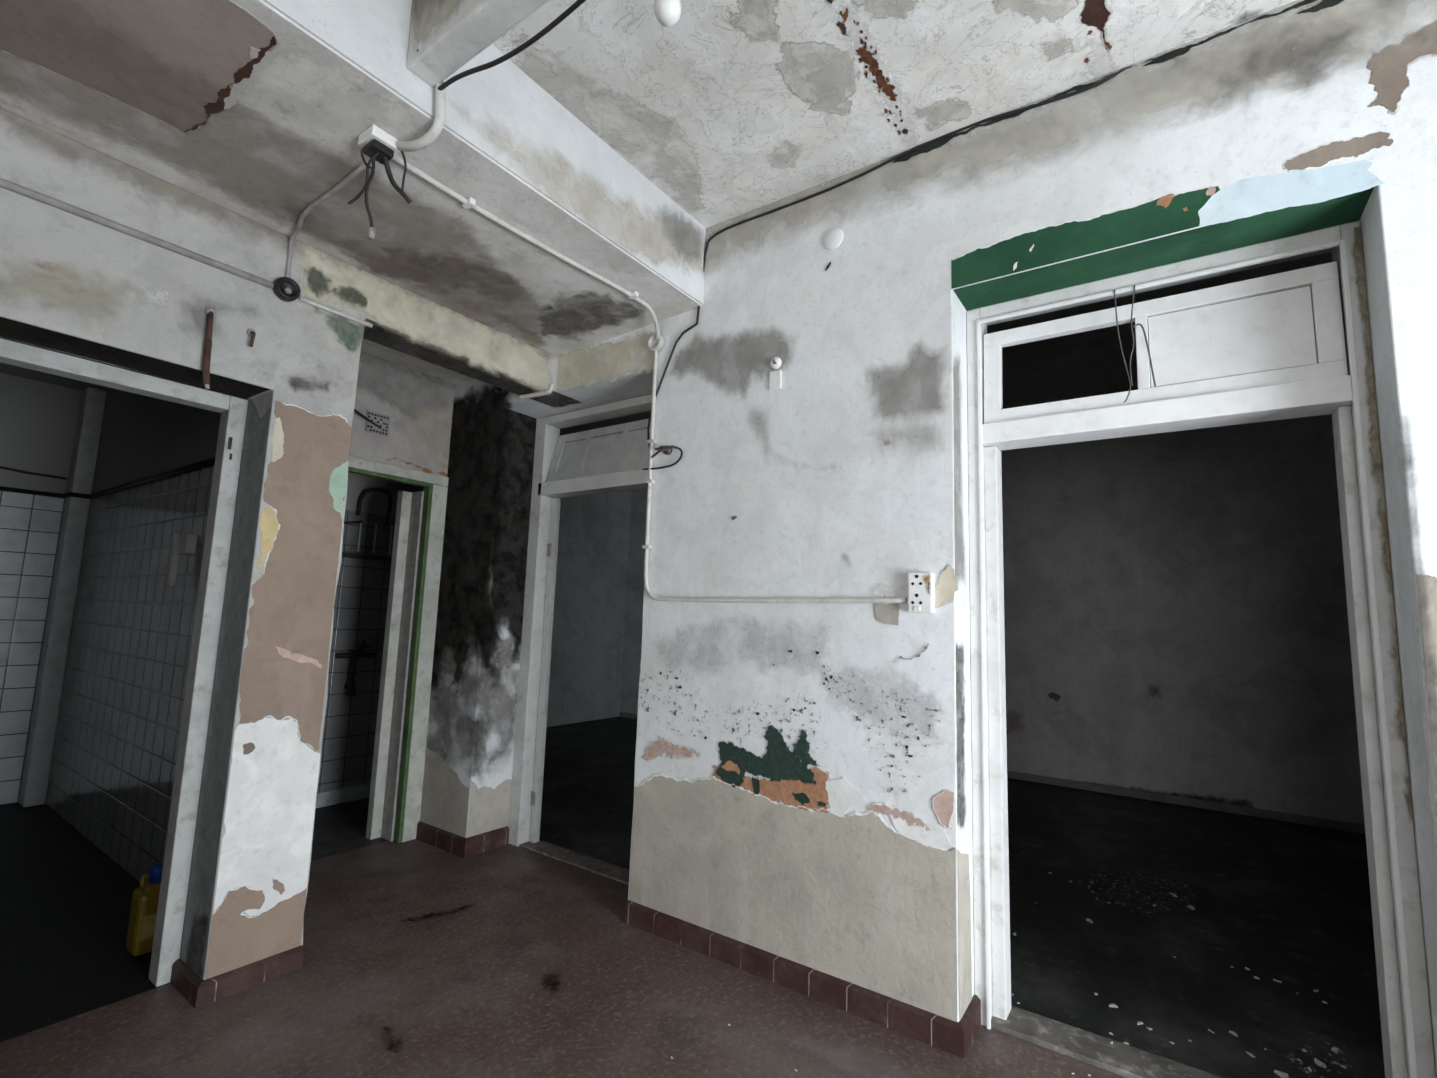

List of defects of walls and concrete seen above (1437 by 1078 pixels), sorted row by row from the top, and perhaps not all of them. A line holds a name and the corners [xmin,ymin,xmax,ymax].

spalling [0,0,282,134]
crack [892,0,1344,163]
peeling [1366,19,1437,115]
peeling [1156,193,1188,212]
peeling [1282,131,1396,173]
water stain [0,0,655,777]
water stain [675,333,788,391]
peeling [239,400,352,751]
peeling [1417,575,1437,693]
peeling [243,742,255,754]
peeling [205,879,307,980]
peeling [629,738,958,1022]